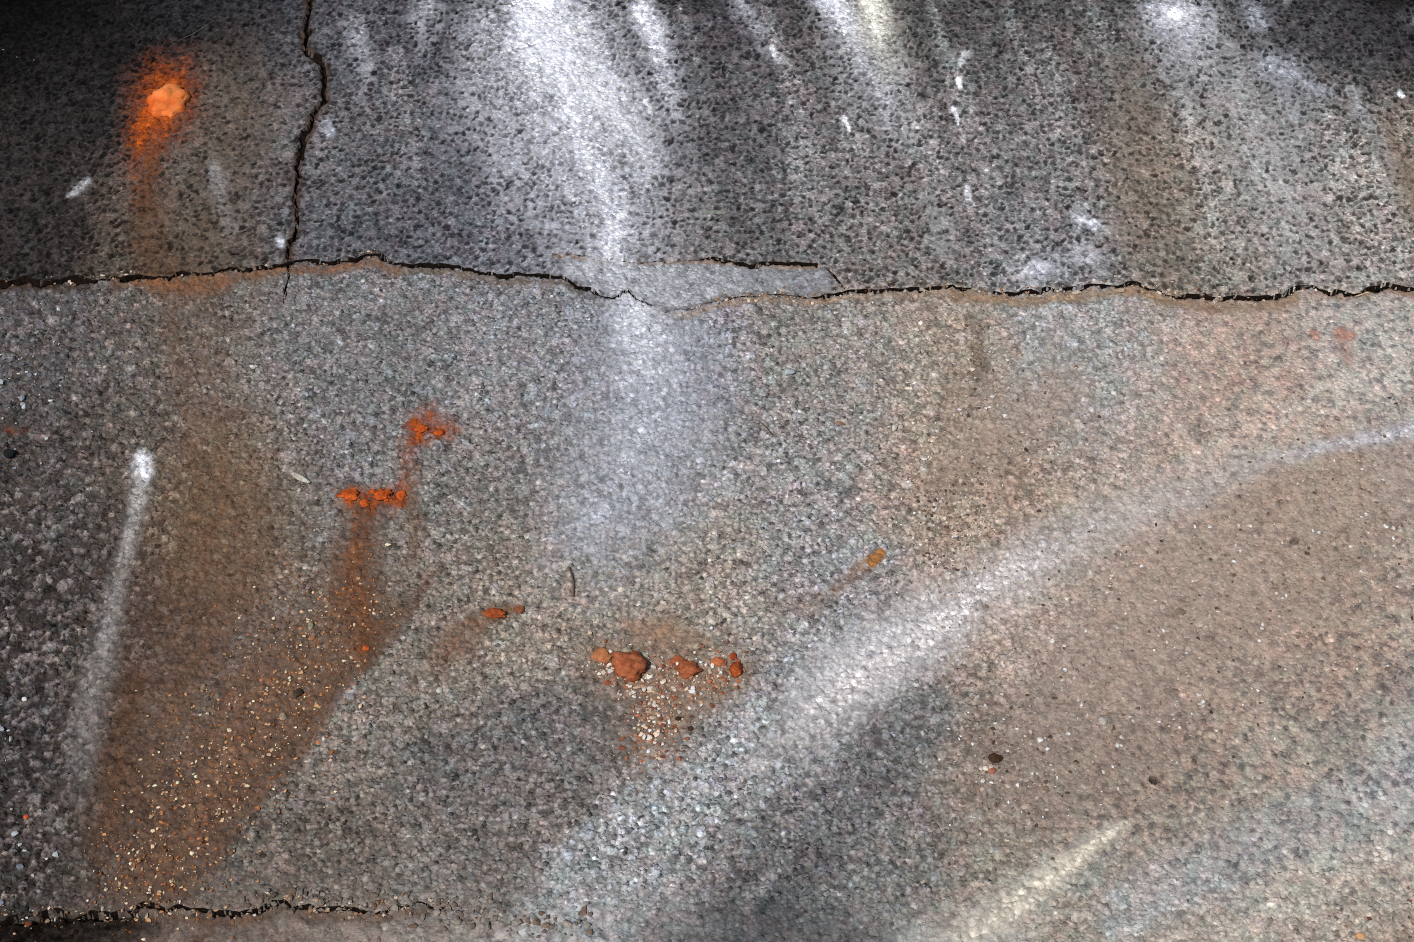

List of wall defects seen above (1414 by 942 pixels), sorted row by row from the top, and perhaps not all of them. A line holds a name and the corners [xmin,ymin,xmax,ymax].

rust [127,65,194,174]
crack [0,0,1414,319]
rust [408,410,442,444]
rust [605,625,731,745]
crack [0,899,462,932]